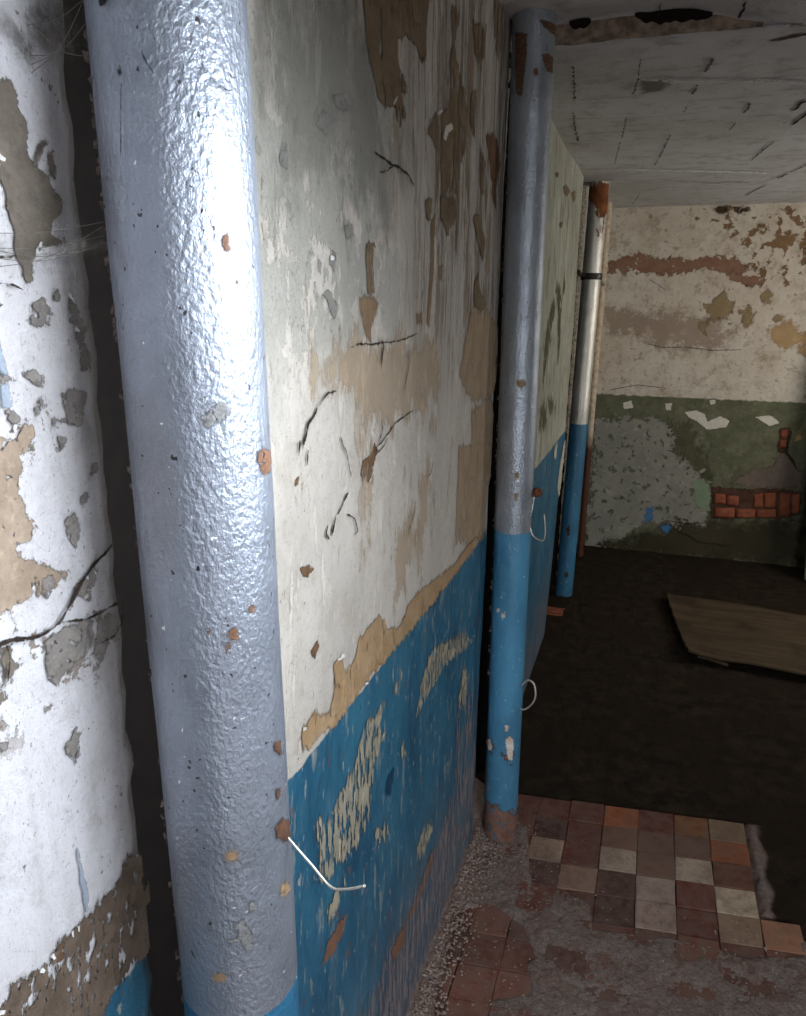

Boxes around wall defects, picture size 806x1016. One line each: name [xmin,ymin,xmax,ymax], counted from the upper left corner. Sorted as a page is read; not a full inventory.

rust [515,32,553,96]
hole [635,9,713,25]
peeling [0,77,63,284]
rust [588,181,609,237]
peeling [26,288,91,372]
crack [352,333,418,453]
peeling [0,369,98,622]
peeling [300,272,498,752]
crack [0,544,124,681]
peeling [0,645,20,704]
rust [483,800,518,843]
peeling [0,852,150,1016]